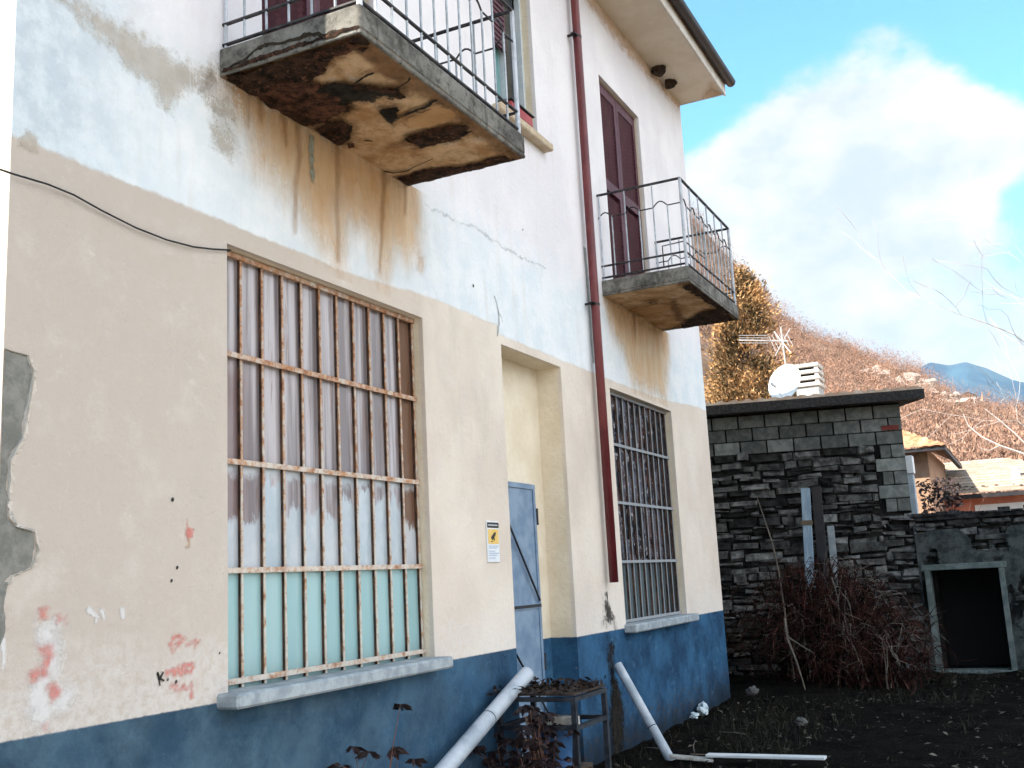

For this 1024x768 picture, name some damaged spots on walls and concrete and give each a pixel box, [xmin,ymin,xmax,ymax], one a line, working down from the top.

spalling [392,124,472,149]
spalling [396,156,515,186]
flaking render [0,348,42,645]
water stain [603,592,615,625]
flaking render [914,524,1024,671]
water stain [607,641,625,754]